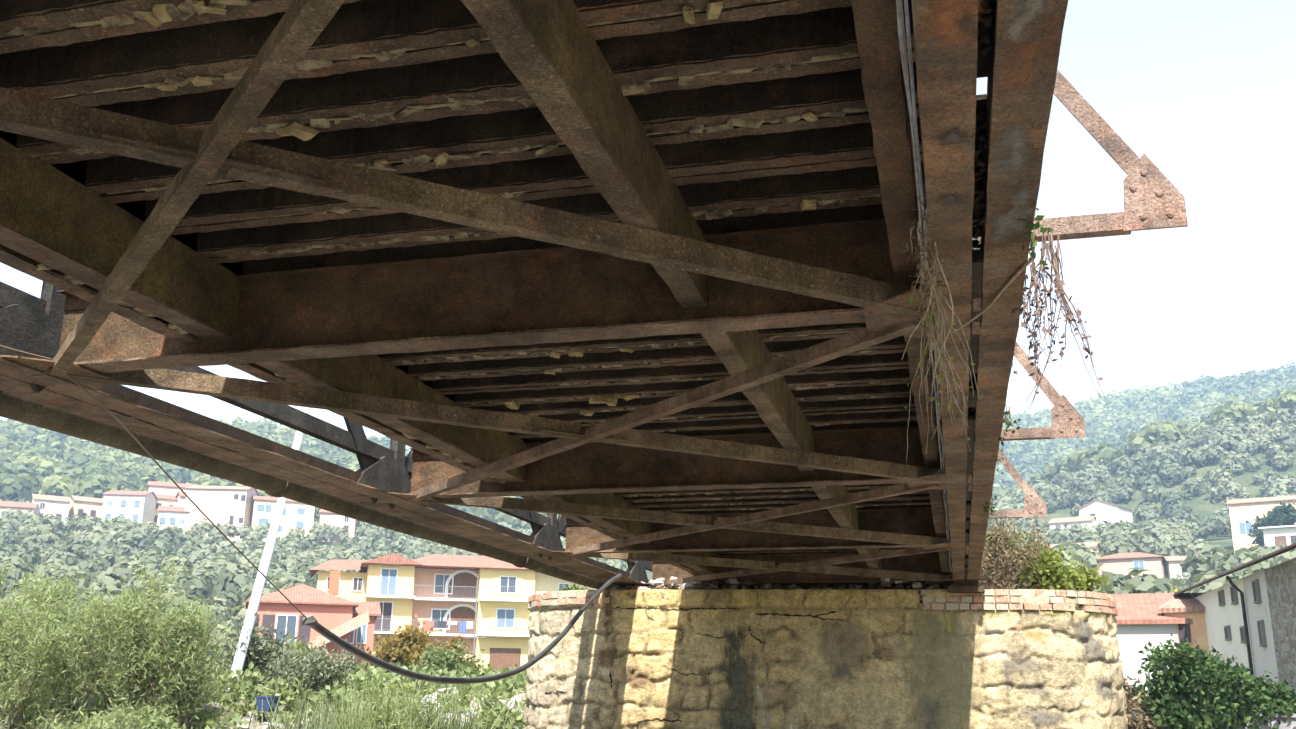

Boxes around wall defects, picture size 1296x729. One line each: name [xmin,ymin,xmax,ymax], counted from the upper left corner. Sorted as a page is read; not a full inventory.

crack [614,606,845,644]